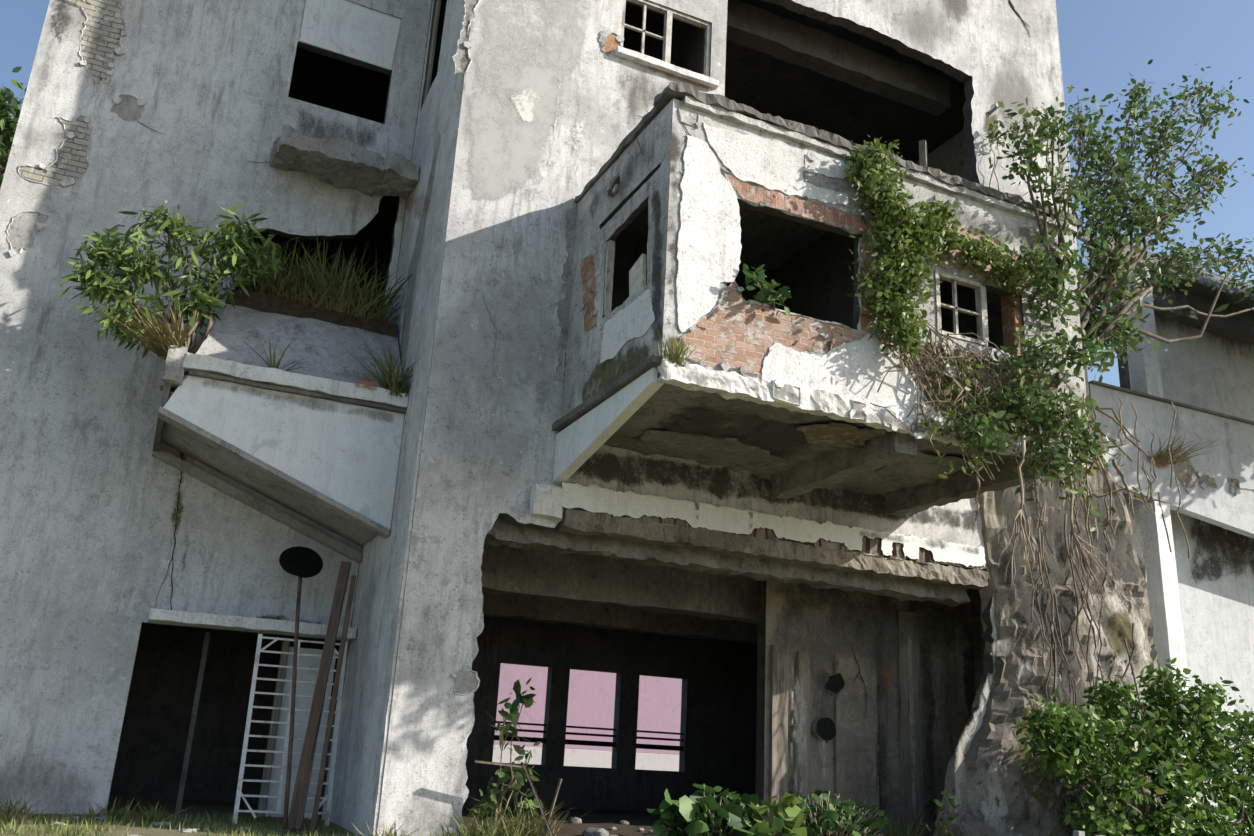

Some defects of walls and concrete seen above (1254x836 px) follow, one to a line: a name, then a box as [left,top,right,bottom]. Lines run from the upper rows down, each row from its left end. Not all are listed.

flaking render [63,0,127,84]
peeling [451,0,624,200]
flaking render [18,114,91,187]
peeling [553,205,598,382]
flaking render [678,152,1059,449]
damp [661,404,809,458]
damp [575,453,978,530]
spalling [1173,457,1241,496]
crack [149,453,183,624]
spalling [814,536,936,565]
damp [1191,519,1254,582]
flaking render [451,665,480,696]